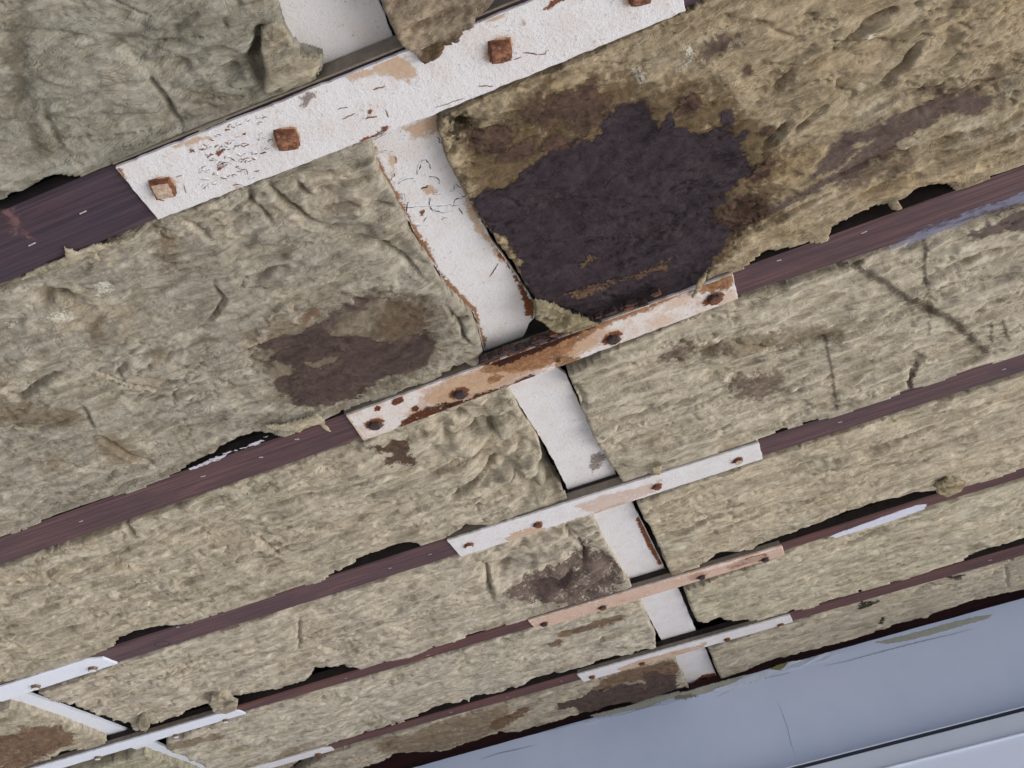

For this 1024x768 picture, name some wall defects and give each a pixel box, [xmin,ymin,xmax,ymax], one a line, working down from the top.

damp [422,41,446,64]
damp [442,26,1009,319]
damp [257,296,436,407]
rust [349,126,733,467]
damp [489,538,627,607]
rust [636,517,662,565]